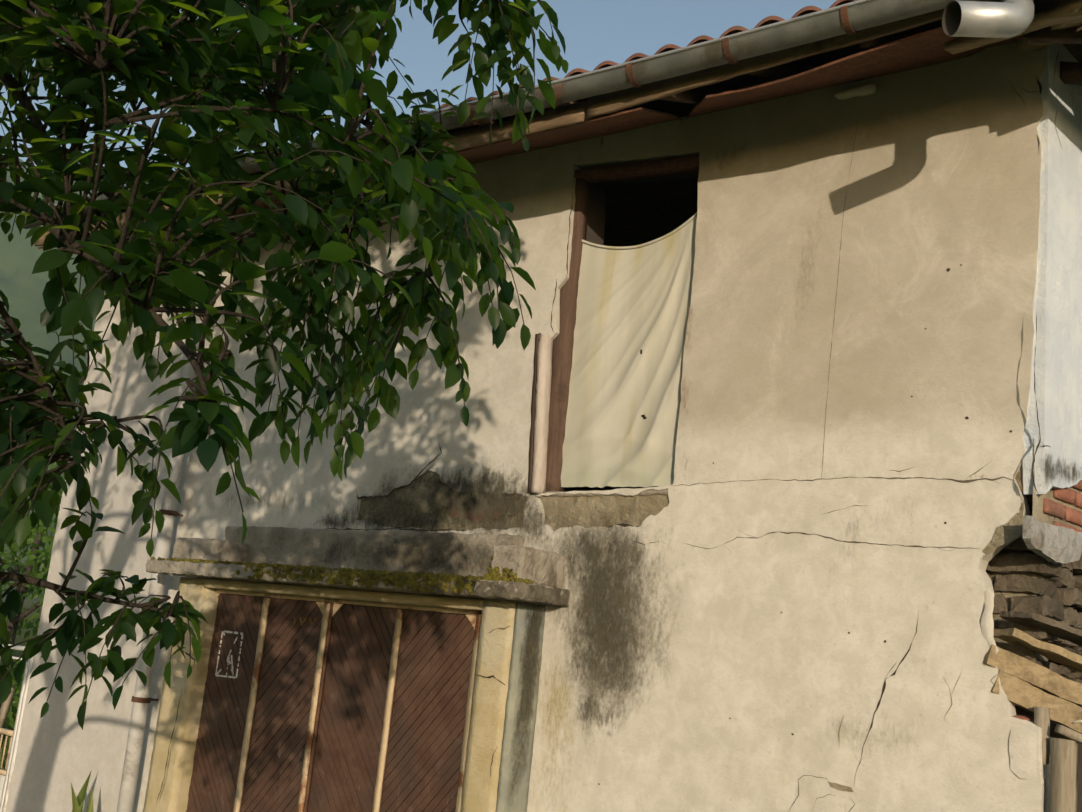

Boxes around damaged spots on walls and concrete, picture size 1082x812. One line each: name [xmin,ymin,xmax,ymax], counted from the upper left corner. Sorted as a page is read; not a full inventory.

crack [675,110,1050,496]
peeling [357,471,669,531]
crack [635,505,977,551]
spalling [982,463,1082,557]
water stain [1045,459,1077,483]
water stain [571,534,641,689]
flaking render [981,587,999,654]
crack [854,610,919,784]